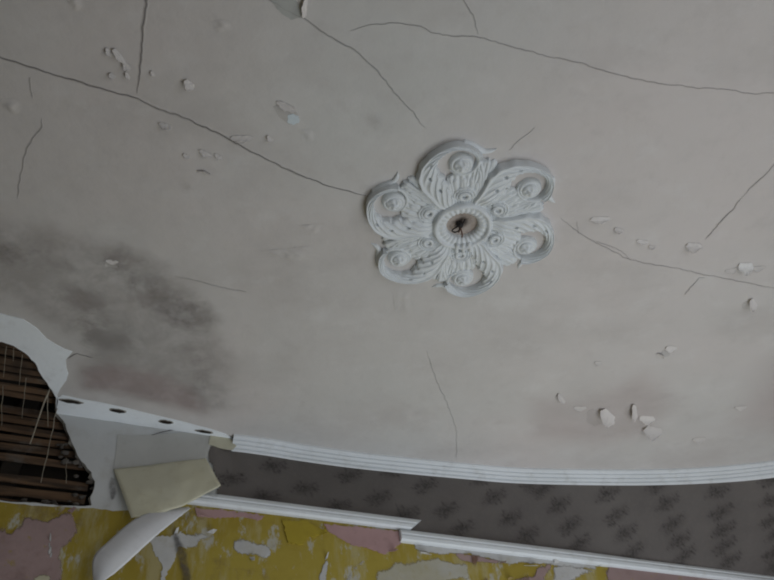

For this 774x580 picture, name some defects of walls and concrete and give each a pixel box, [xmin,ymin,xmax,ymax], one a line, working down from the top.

peeling [271,0,308,20]
crack [268,0,774,128]
peeling [574,405,662,442]
flaking render [0,313,233,580]
peeling [195,508,264,521]
peeling [234,539,271,560]
peeling [319,552,329,580]
peeling [282,520,401,554]
peeling [376,544,716,580]